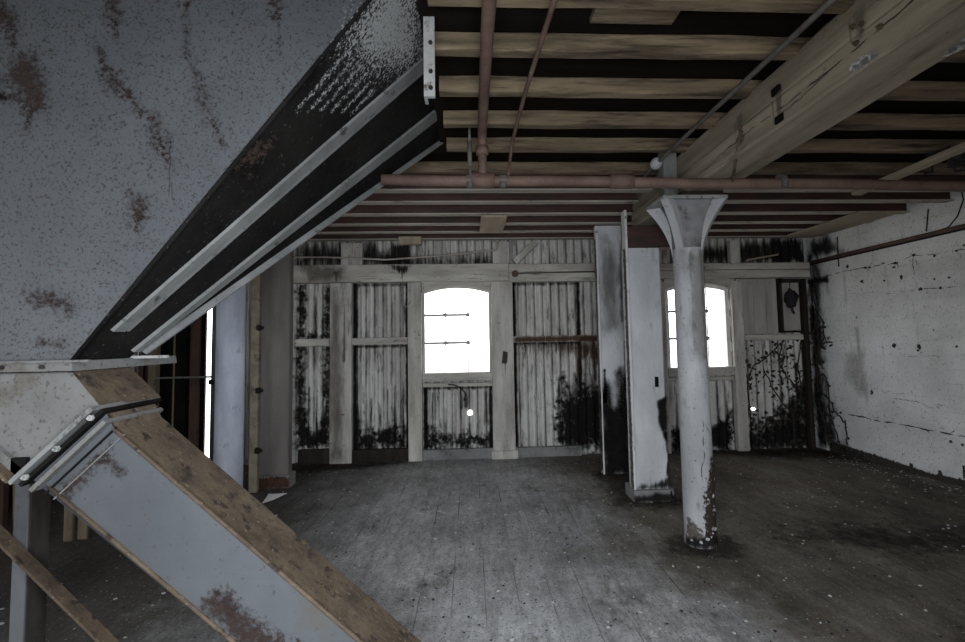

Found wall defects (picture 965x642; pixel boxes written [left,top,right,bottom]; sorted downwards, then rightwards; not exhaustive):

rust [0,0,49,130]
rust [93,46,171,169]
rust [127,190,149,232]
rust [26,285,72,316]
peeling [686,454,718,550]
rust [201,589,285,642]